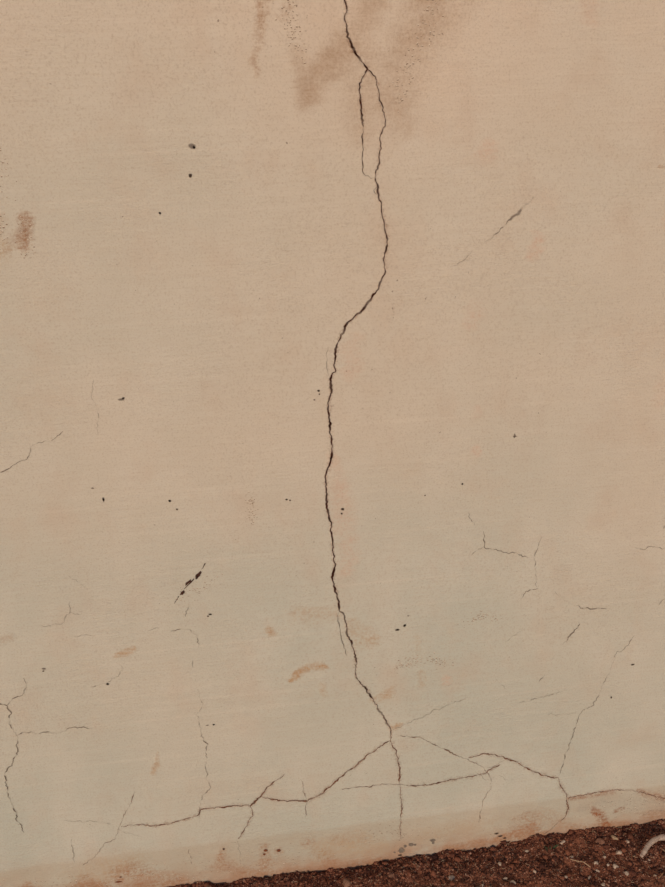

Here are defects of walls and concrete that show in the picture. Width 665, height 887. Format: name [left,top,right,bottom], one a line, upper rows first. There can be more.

water stain [247,0,295,78]
water stain [285,0,489,152]
water stain [0,188,38,277]
crack [83,0,617,865]